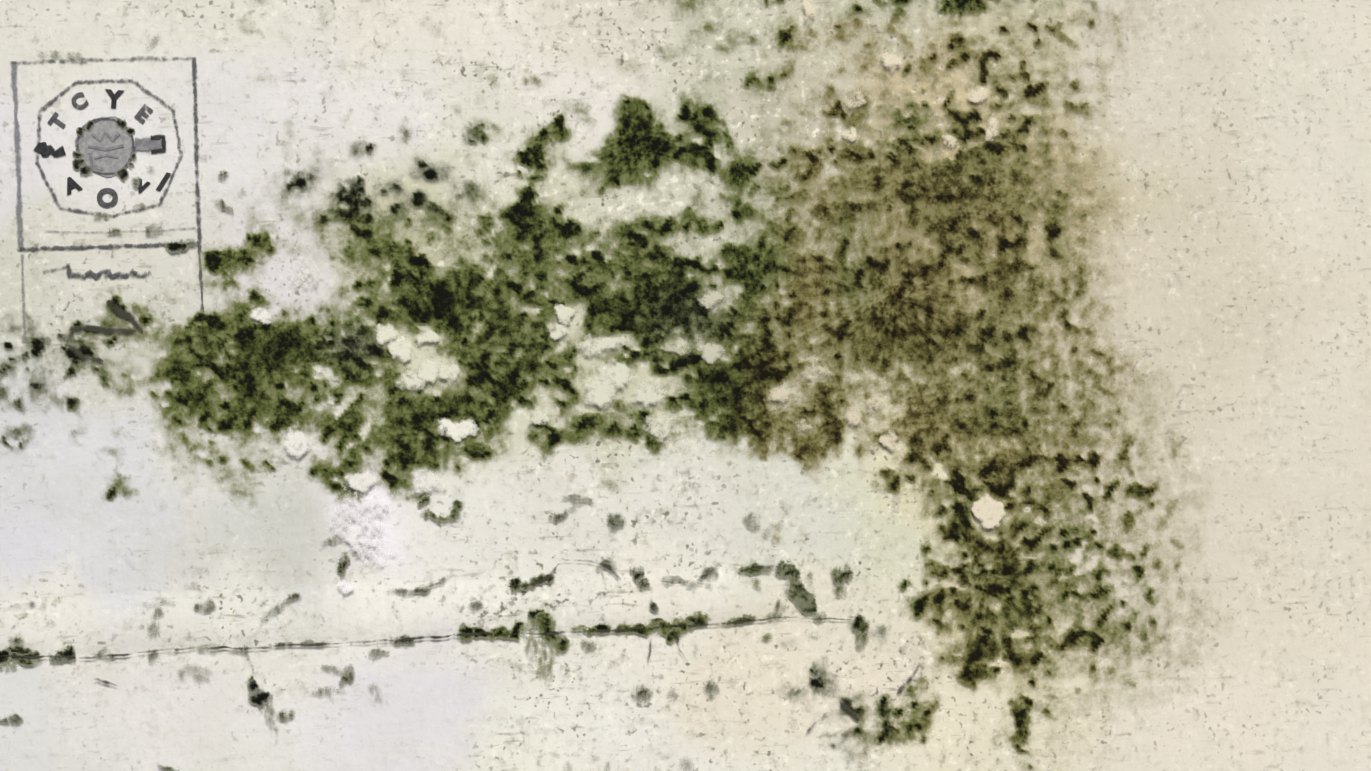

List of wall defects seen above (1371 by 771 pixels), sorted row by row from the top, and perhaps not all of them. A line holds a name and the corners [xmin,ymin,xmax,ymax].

water stain [0,94,739,523]
peeling [377,324,459,389]
peeling [549,304,673,441]
peeling [439,419,479,441]
peeling [529,410,549,424]
peeling [972,494,1006,528]
crack [507,560,619,587]
water stain [0,636,76,671]
crack [4,616,850,685]
water stain [453,558,827,676]
water stain [873,458,1184,769]
water stain [787,662,940,757]